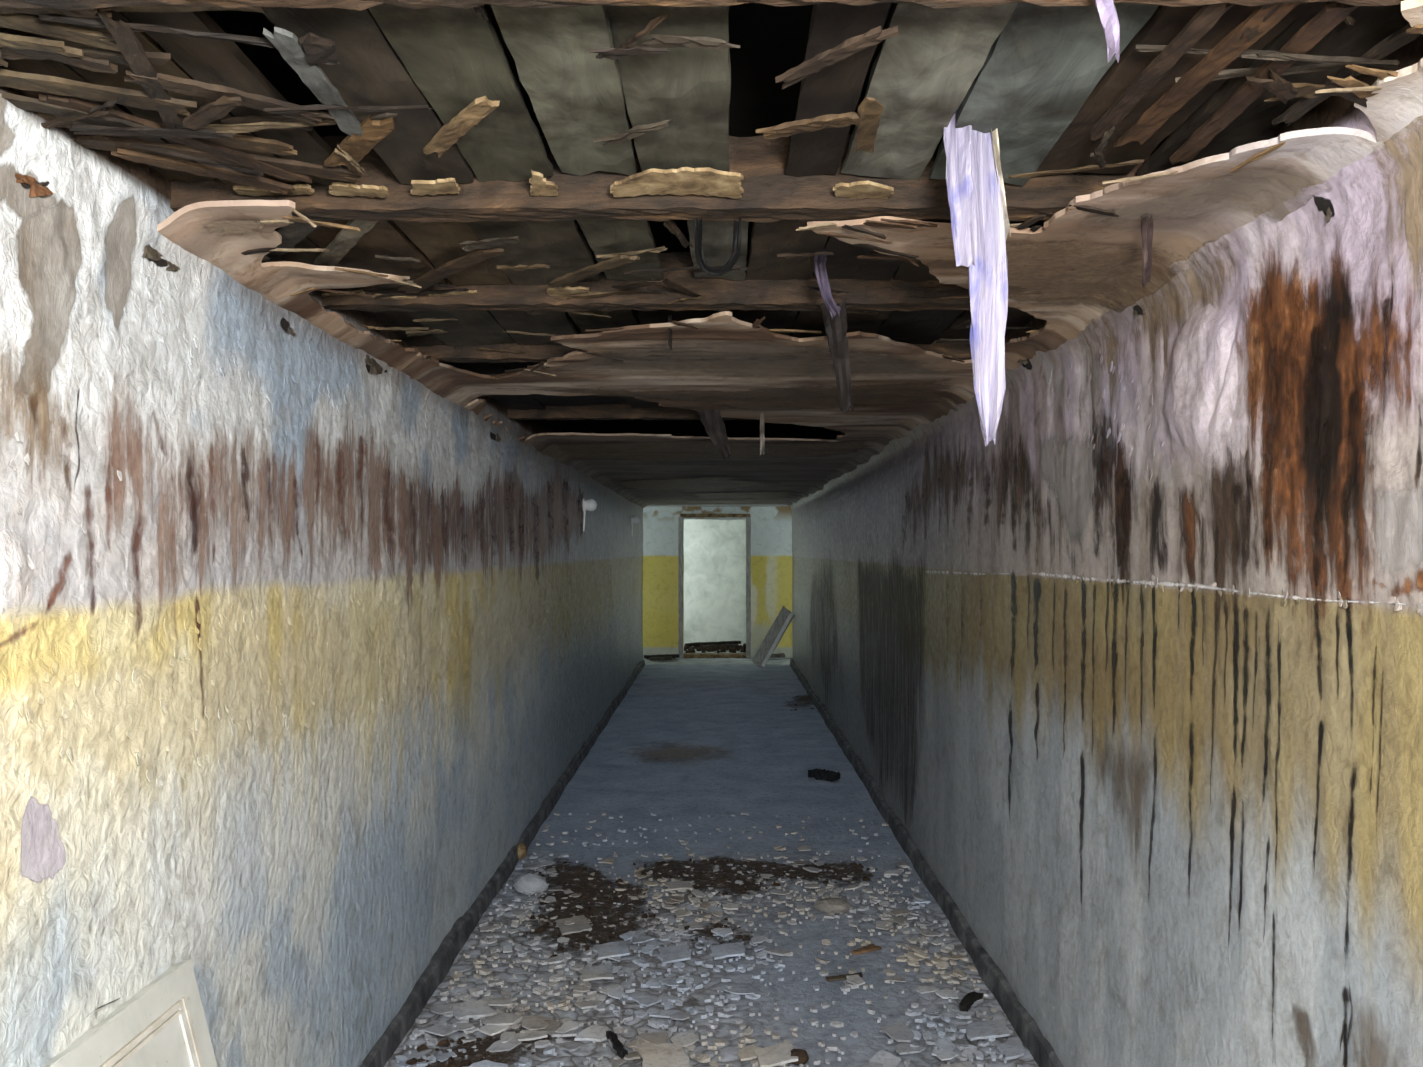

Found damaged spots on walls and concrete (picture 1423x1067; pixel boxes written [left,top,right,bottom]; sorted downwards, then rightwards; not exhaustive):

peeling [0,93,82,398]
peeling [105,196,201,381]
spalling [1313,195,1335,224]
leakage [903,422,1024,546]
rust [47,554,71,610]
rust [86,402,583,718]
leakage [859,560,925,823]
rust [1011,252,1423,1037]
peeling [1032,572,1423,616]
peeling [21,797,66,882]
leakage [1107,754,1146,846]
leakage [1294,1009,1313,1067]